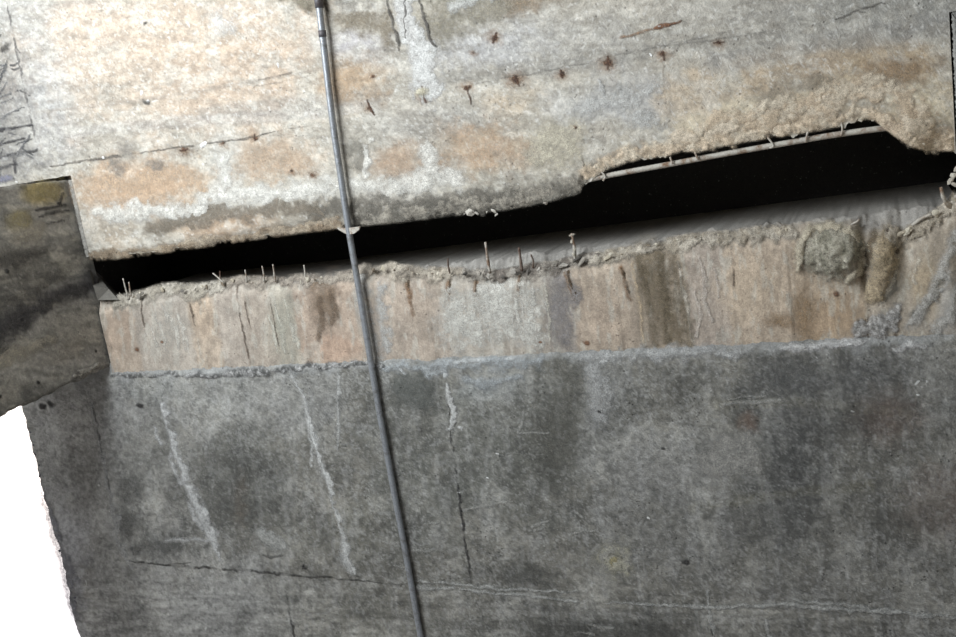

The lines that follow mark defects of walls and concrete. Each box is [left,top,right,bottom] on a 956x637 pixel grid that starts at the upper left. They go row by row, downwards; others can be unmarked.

damp [296,0,393,45]
crack [386,0,435,49]
corrosion [621,20,681,38]
crack [50,128,291,167]
spalling [88,69,956,259]
spalling [112,224,799,310]
damp [309,281,339,339]
damp [356,273,582,431]
damp [773,298,868,353]
damp [291,375,356,574]
crack [448,406,470,574]
crack [134,561,396,585]